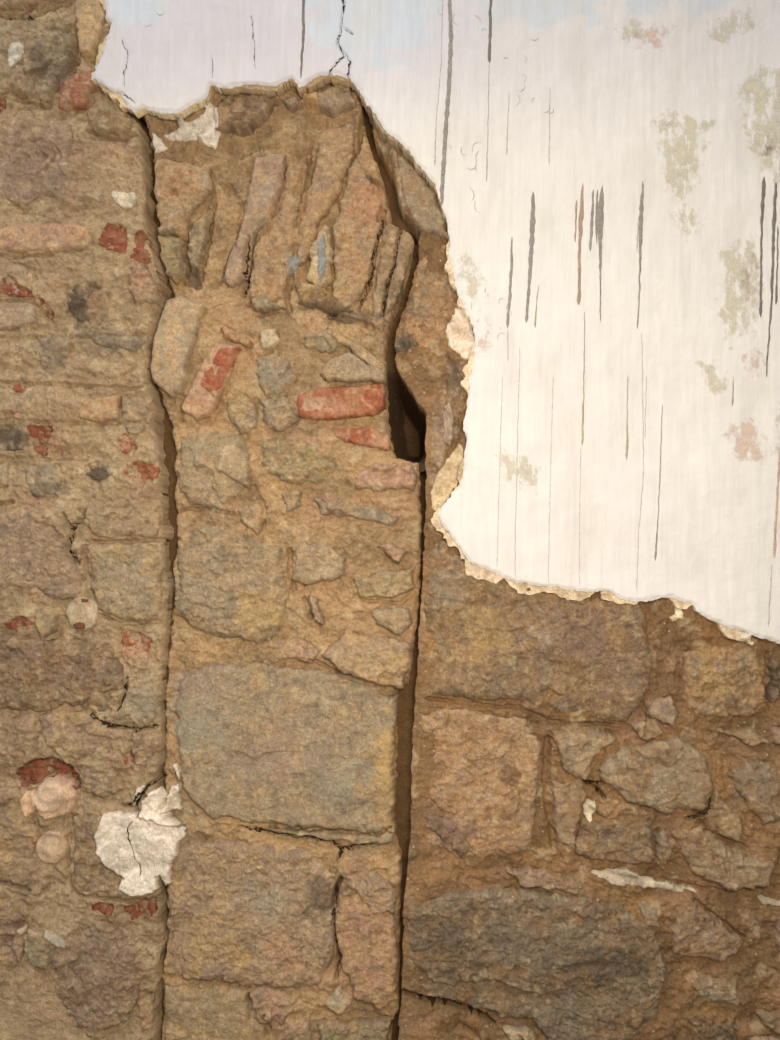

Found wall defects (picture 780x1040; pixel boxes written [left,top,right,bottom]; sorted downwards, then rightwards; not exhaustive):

spalling [99,222,160,265]
crack [142,127,175,299]
crack [359,107,419,372]
water stain [720,69,780,377]
spalling [201,348,242,397]
water stain [636,181,647,588]
crack [90,384,178,732]
water stain [654,404,663,560]
water stain [768,447,780,627]
spalling [16,757,82,789]
peeling [132,763,183,826]
crack [242,471,484,1040]